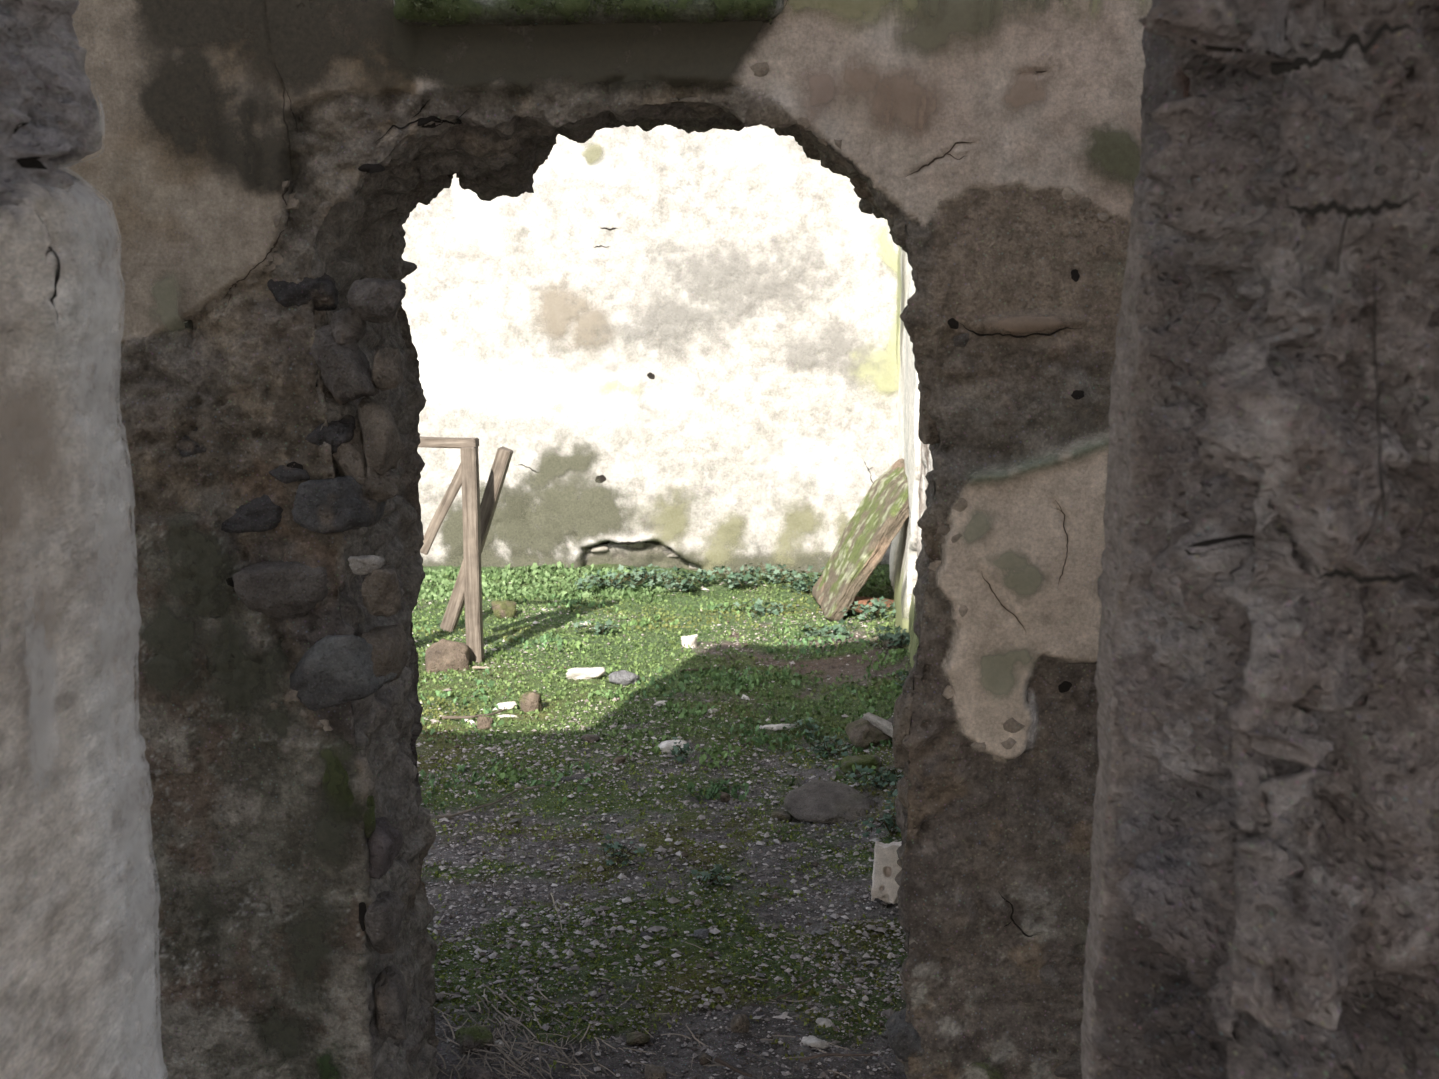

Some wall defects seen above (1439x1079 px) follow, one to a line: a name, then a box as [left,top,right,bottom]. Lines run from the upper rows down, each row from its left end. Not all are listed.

crack [1190,22,1418,76]
crack [38,215,60,323]
damp [454,191,503,256]
crack [1282,193,1420,276]
damp [413,340,695,428]
damp [422,503,464,567]
flaking render [115,62,842,1079]
damp [480,445,831,574]
crack [981,571,1026,632]
spalling [892,185,1131,1079]
crack [1054,500,1068,585]